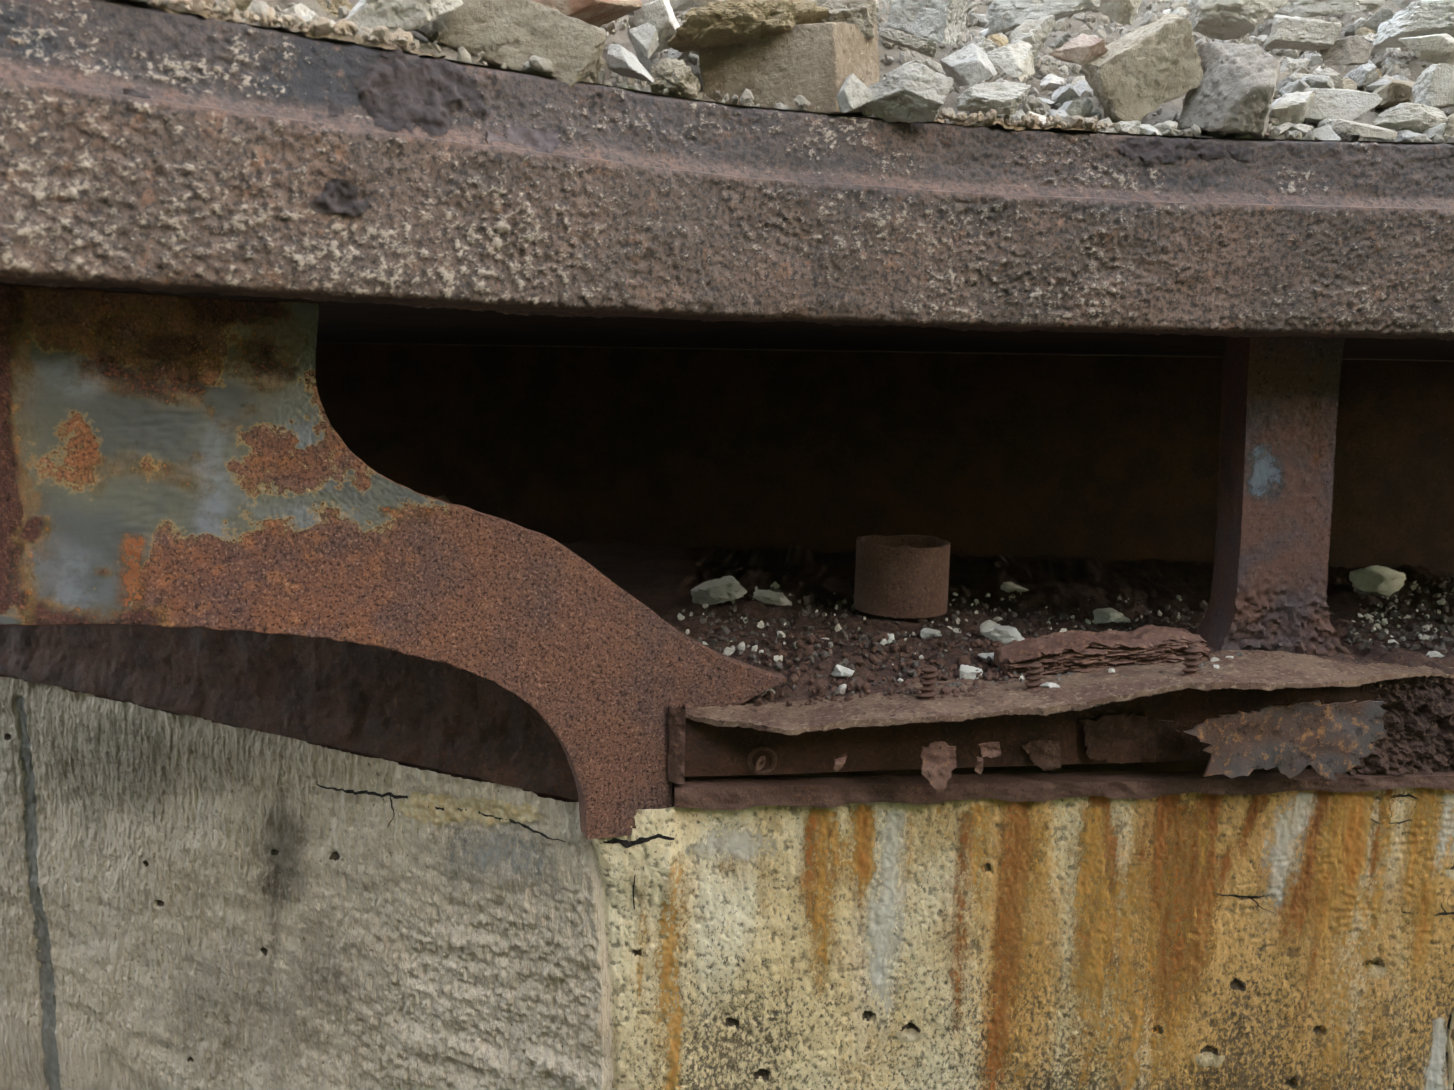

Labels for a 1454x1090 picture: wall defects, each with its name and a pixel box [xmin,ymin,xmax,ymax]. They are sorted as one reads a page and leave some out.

corrosion [123,88,150,99]
corrosion [0,285,165,626]
corrosion [833,756,847,771]
corrosion [1021,737,1061,771]
crack [317,784,565,842]
crack [1341,792,1445,825]
corrosion [800,805,877,990]
corrosion [907,741,1054,1090]
corrosion [1057,699,1444,1090]
crack [1401,903,1454,916]
corrosion [636,855,689,1090]
crack [1444,1008,1454,1090]